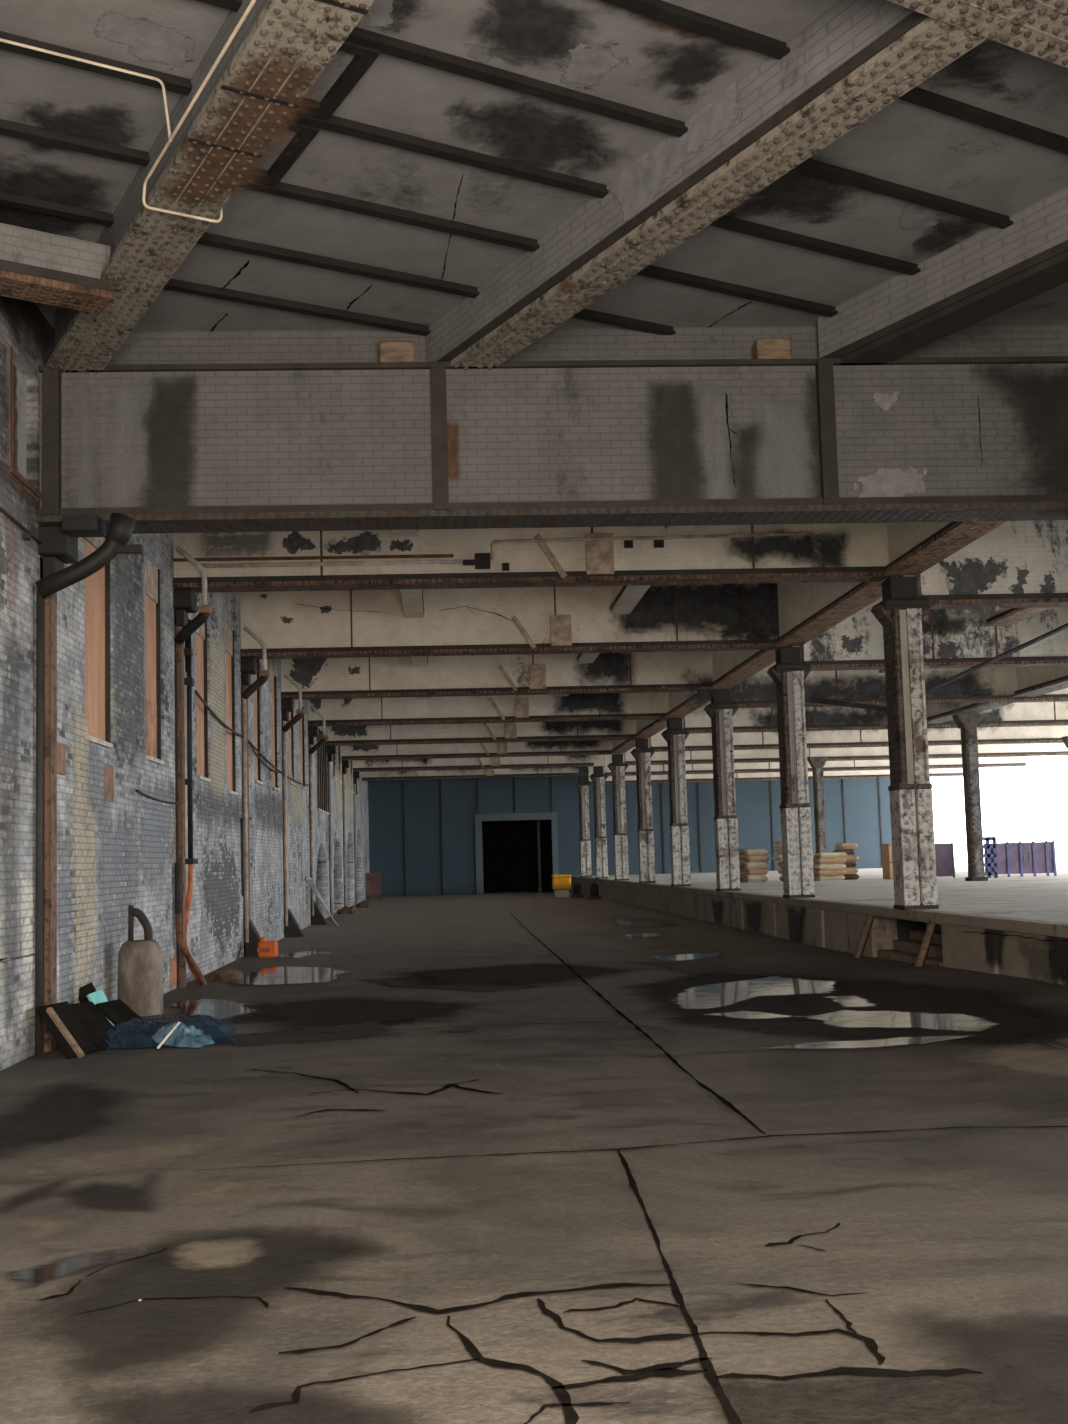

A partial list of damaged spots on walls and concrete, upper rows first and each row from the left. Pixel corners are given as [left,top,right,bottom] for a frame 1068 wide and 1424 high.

leakage [382,0,416,29]
leakage [476,0,583,64]
leakage [649,44,727,100]
leakage [650,379,821,500]
peeling [282,531,413,555]
peeling [0,532,10,626]
peeling [939,557,1058,615]
leakage [637,962,1068,1049]
crack [765,1223,840,1251]
crack [40,1248,983,1424]